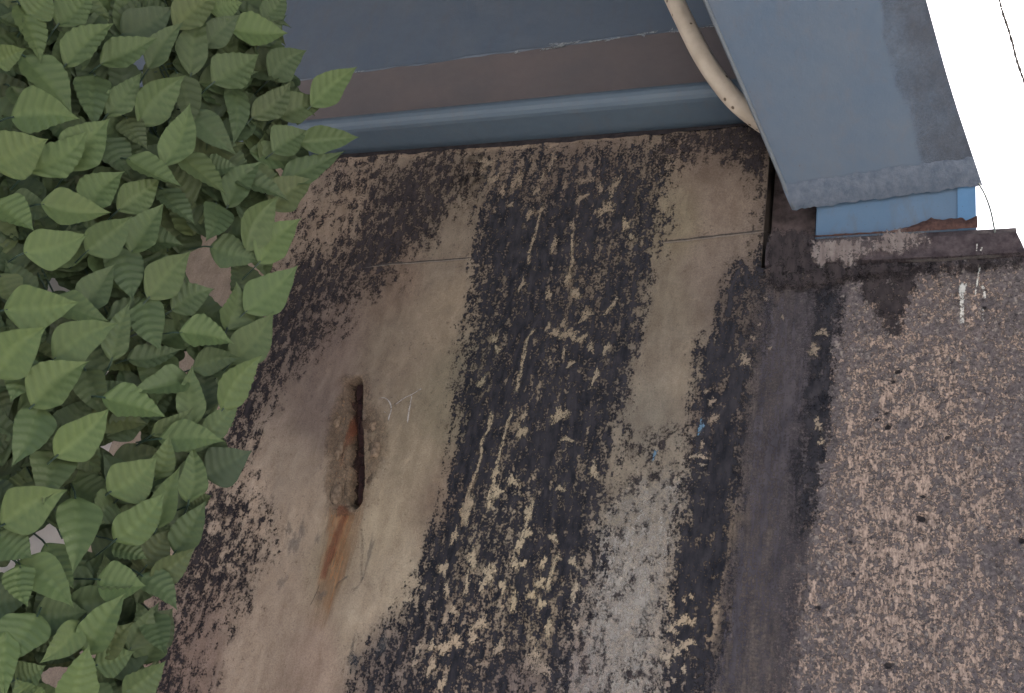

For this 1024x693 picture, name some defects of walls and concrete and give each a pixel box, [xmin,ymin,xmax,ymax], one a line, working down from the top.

spalling [326,379,381,514]
water stain [153,125,1024,693]
rust [319,511,354,611]